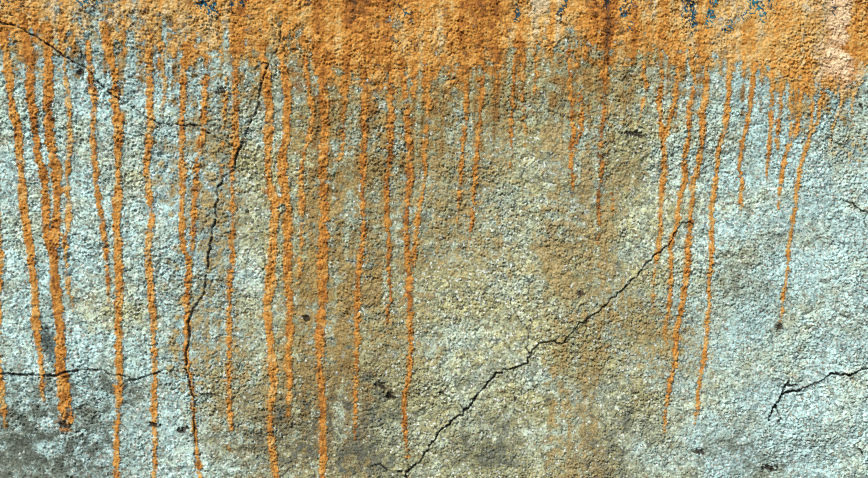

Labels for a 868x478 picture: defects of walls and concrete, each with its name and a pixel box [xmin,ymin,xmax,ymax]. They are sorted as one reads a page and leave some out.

crack [0,14,120,100]
crack [1,29,281,463]
corrosion [143,211,158,478]
corrosion [188,127,206,251]
corrosion [198,74,210,124]
corrosion [262,188,295,478]
corrosion [400,103,429,458]
crack [367,221,693,478]
corrosion [568,107,582,190]
corrosion [654,82,669,265]
corrosion [765,110,780,176]
crack [768,380,808,423]